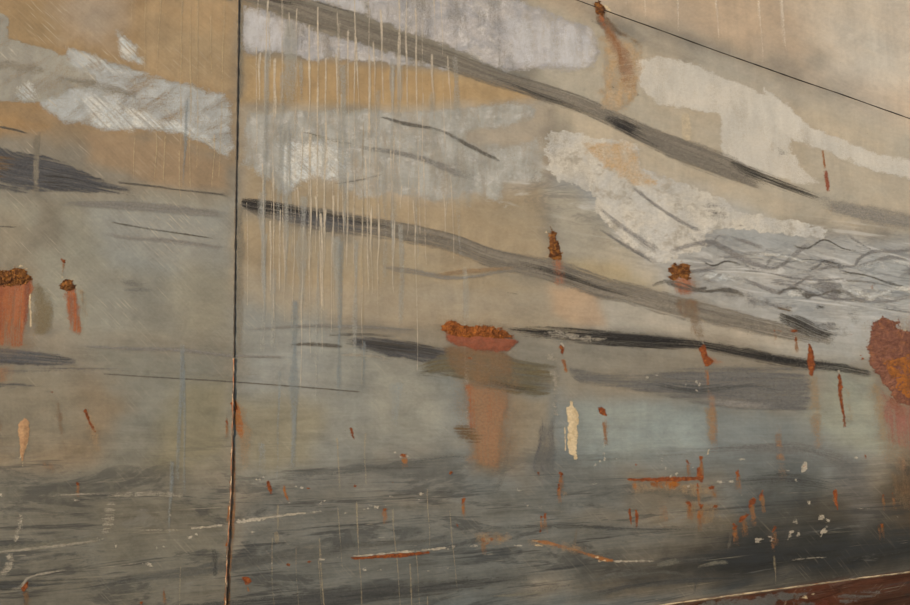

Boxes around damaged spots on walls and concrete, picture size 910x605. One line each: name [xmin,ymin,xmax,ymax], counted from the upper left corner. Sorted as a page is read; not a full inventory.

corrosion [586,0,646,114]
corrosion [545,226,565,286]
corrosion [0,259,88,384]
corrosion [433,313,525,477]
corrosion [668,260,721,449]
corrosion [774,329,826,448]
corrosion [837,370,854,426]
corrosion [860,312,910,465]
corrosion [224,399,253,605]